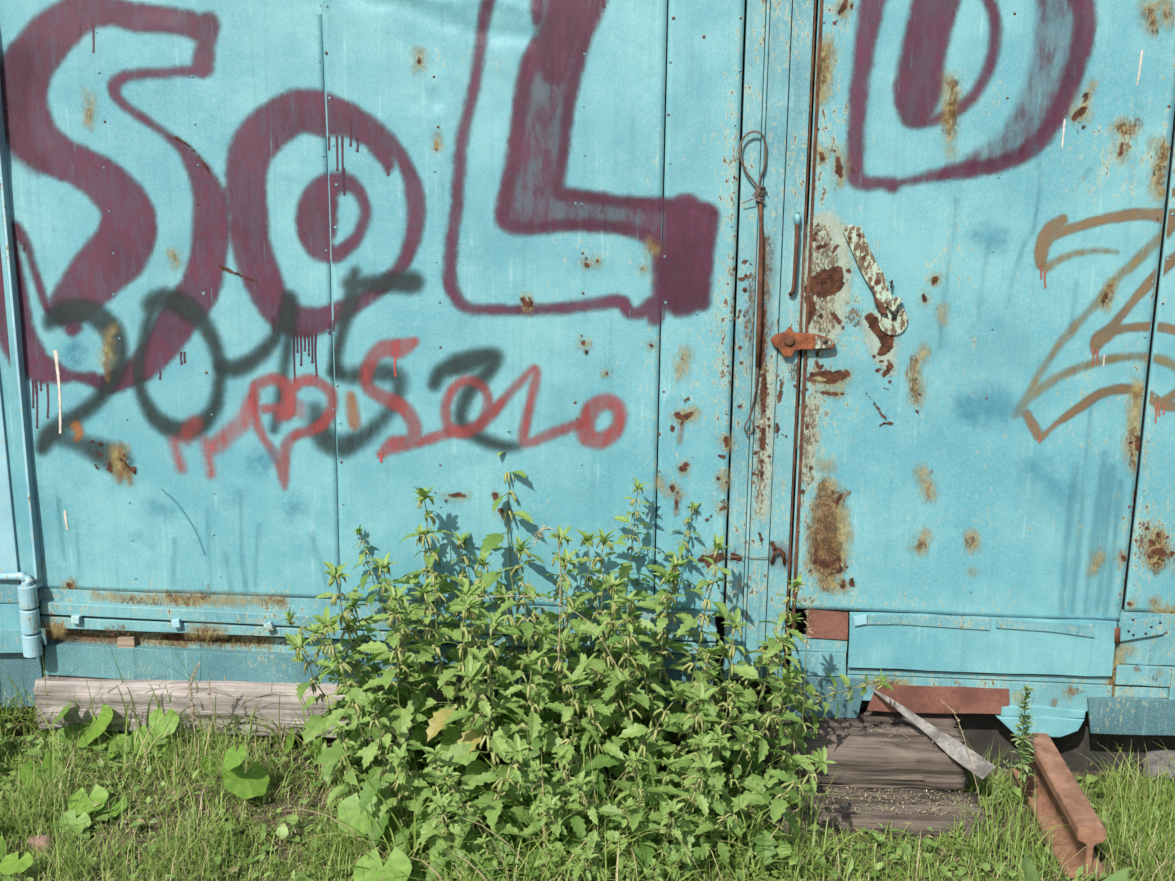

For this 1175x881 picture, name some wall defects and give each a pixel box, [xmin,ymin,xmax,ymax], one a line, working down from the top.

corrosion [1141,0,1172,33]
corrosion [941,78,958,141]
corrosion [1116,118,1143,157]
corrosion [1153,144,1169,197]
peeling [799,212,897,390]
corrosion [733,237,855,591]
corrosion [90,439,136,481]
corrosion [915,530,929,552]
corrosion [964,532,978,549]
corrosion [1120,526,1175,574]
corrosion [96,586,287,607]
corrosion [41,623,271,648]